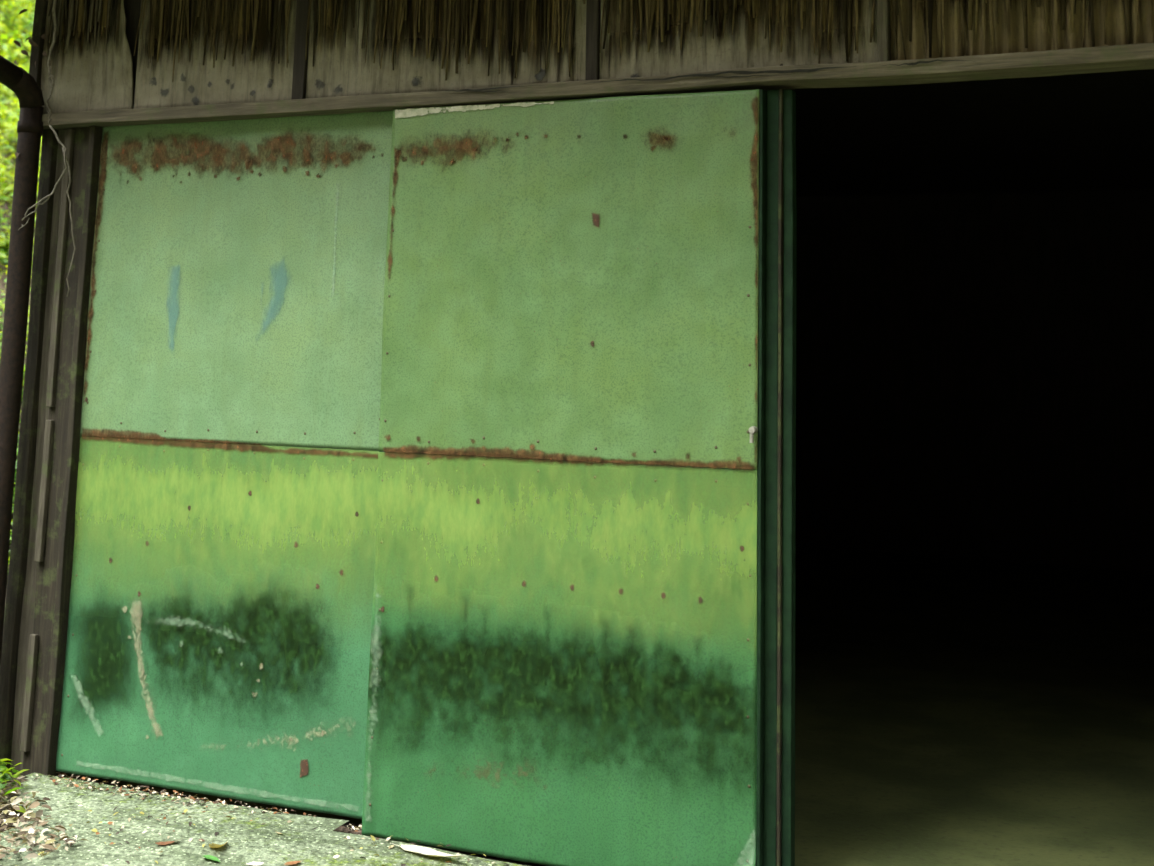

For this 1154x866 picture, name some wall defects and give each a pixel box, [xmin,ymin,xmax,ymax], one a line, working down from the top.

corrosion [750,97,759,246]
corrosion [83,132,528,402]
corrosion [82,429,757,470]
leakage [79,605,130,707]
peeling [123,603,161,738]
leakage [139,594,330,698]
leakage [368,626,757,773]